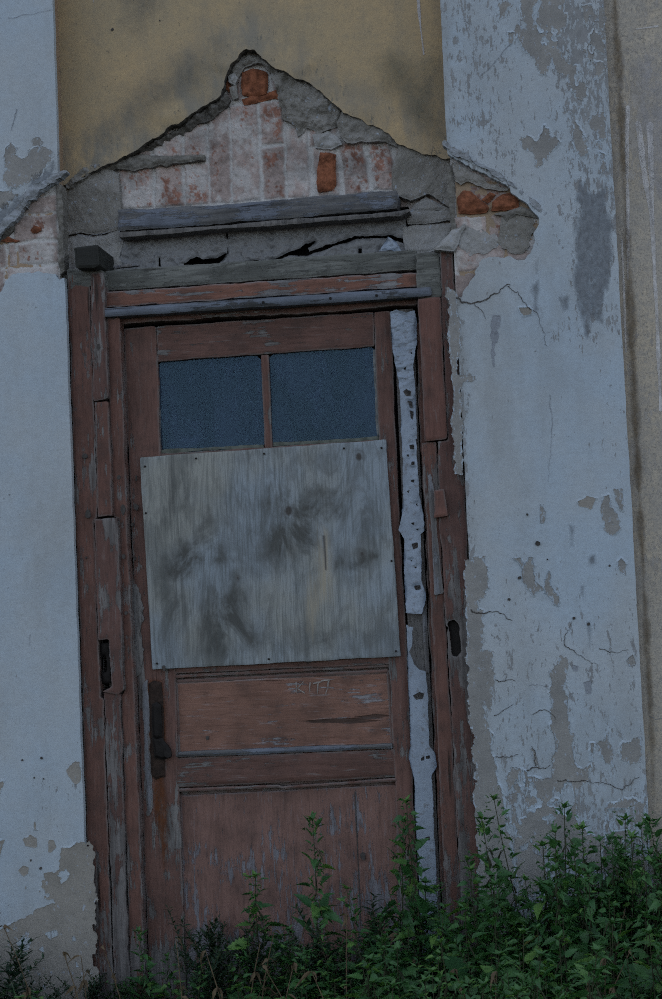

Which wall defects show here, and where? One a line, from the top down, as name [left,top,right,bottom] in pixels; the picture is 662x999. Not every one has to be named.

peeling [497,0,607,100]
spalling [0,53,539,475]
crack [456,284,547,346]
peeling [562,184,612,337]
peeling [576,488,625,537]
peeling [463,555,649,940]
peeling [0,822,101,999]